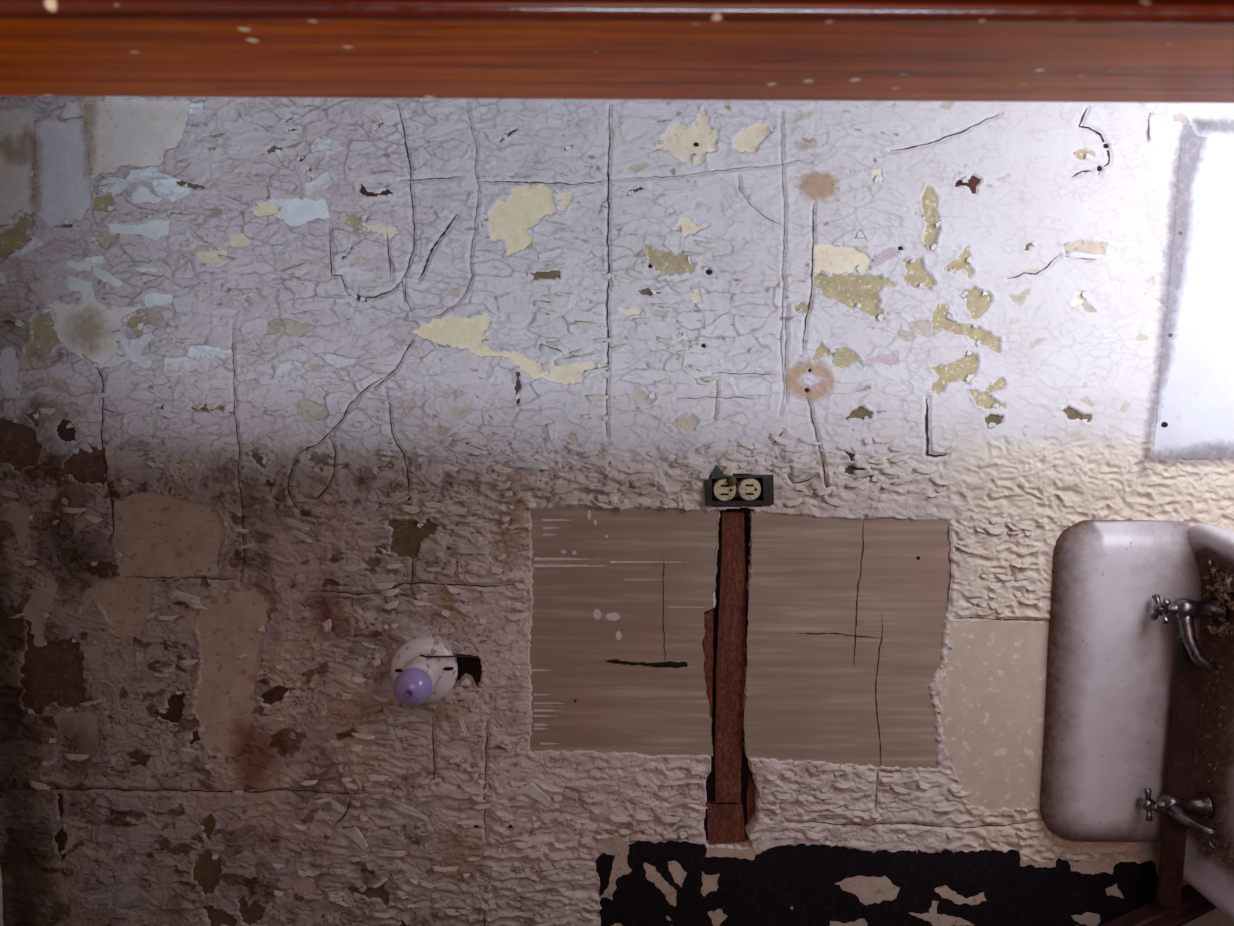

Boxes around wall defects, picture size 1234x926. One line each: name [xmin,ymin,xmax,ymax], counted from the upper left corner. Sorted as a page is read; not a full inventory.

flaking render [0,100,193,259]
crack [125,323,245,582]
crack [288,102,829,518]
flaking render [655,109,718,165]
peeling [812,187,1006,429]
crack [925,398,947,457]
crack [893,114,999,151]
crack [1007,256,1058,279]
crack [1073,108,1110,177]
flaking render [52,479,290,770]
flaking render [372,422,720,776]
flaking render [645,433,1049,814]